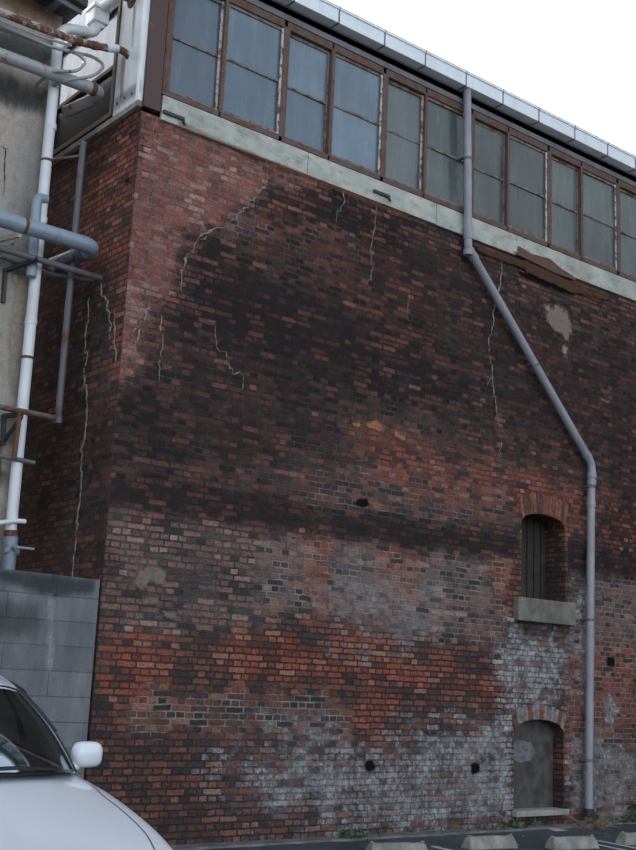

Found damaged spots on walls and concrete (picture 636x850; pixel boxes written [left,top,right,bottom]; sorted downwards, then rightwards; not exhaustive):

crack [180,160,268,298]
crack [367,206,377,285]
crack [207,319,244,389]
crack [487,260,502,452]
spalling [544,304,572,355]
crack [72,282,164,577]
damp [241,587,586,836]
damp [565,739,636,821]